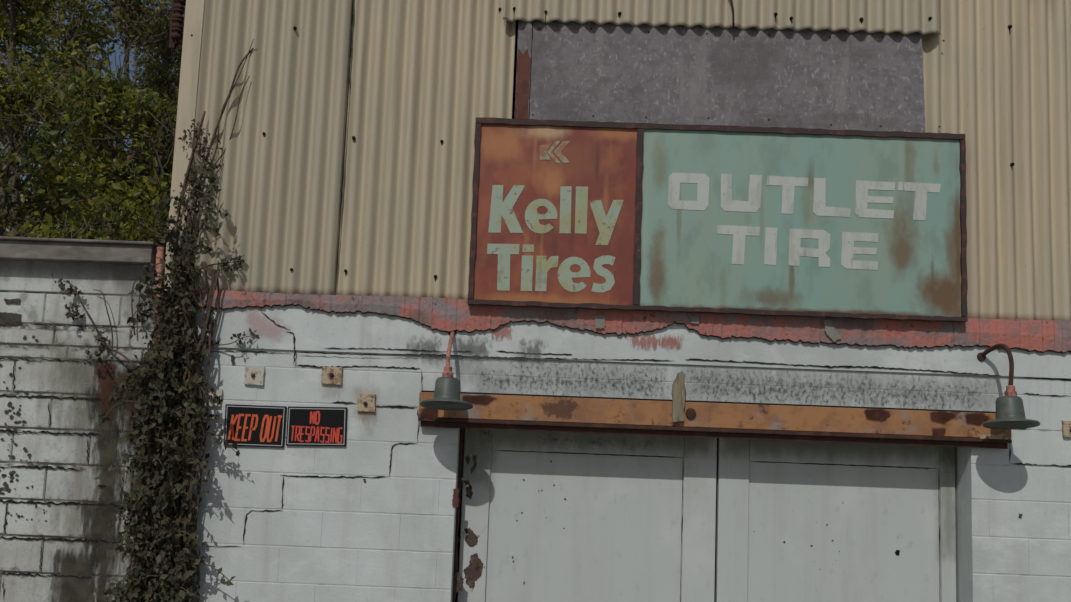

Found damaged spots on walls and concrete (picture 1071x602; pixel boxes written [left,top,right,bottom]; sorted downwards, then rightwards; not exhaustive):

water stain [1,321,110,331]
water stain [0,342,48,362]
peeling [627,335,682,350]
rust [462,395,496,405]
crack [199,309,1071,556]
rust [865,408,890,421]
rust [931,411,990,438]
water stain [28,344,188,602]